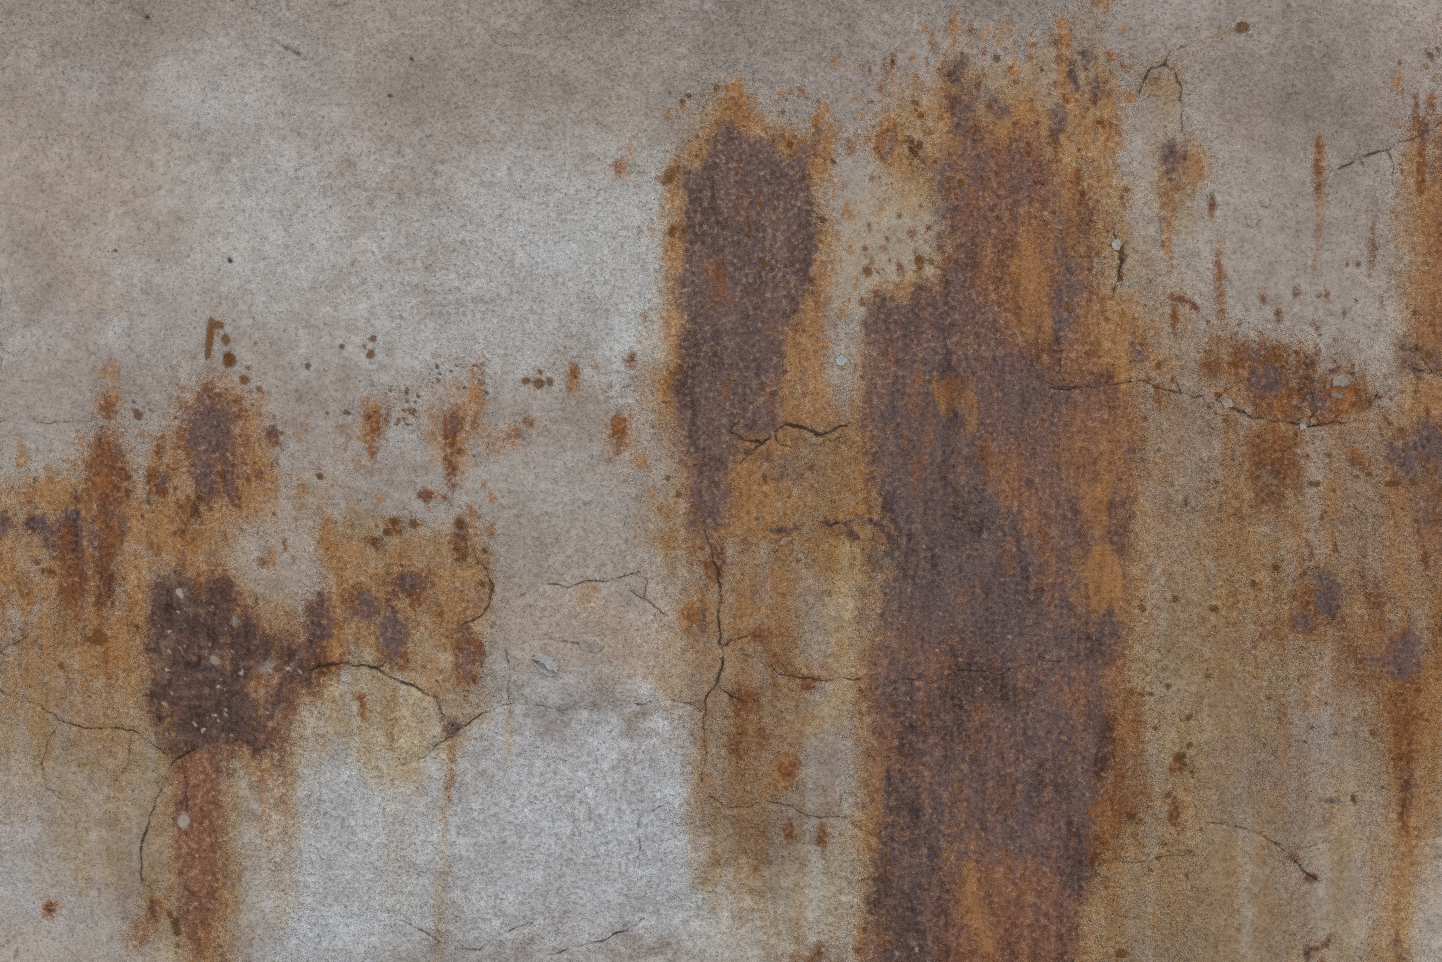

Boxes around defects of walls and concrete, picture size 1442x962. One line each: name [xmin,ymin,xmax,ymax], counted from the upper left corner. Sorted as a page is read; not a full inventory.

rust [1162,142,1202,255]
rust [1171,296,1208,333]
rust [1202,47,1442,580]
rust [655,17,1182,962]
crack [0,689,198,887]
rust [25,317,494,962]
crack [286,650,563,765]
crack [678,528,1050,844]
rust [1170,741,1200,782]
rust [1276,571,1342,667]
rust [1346,576,1440,912]